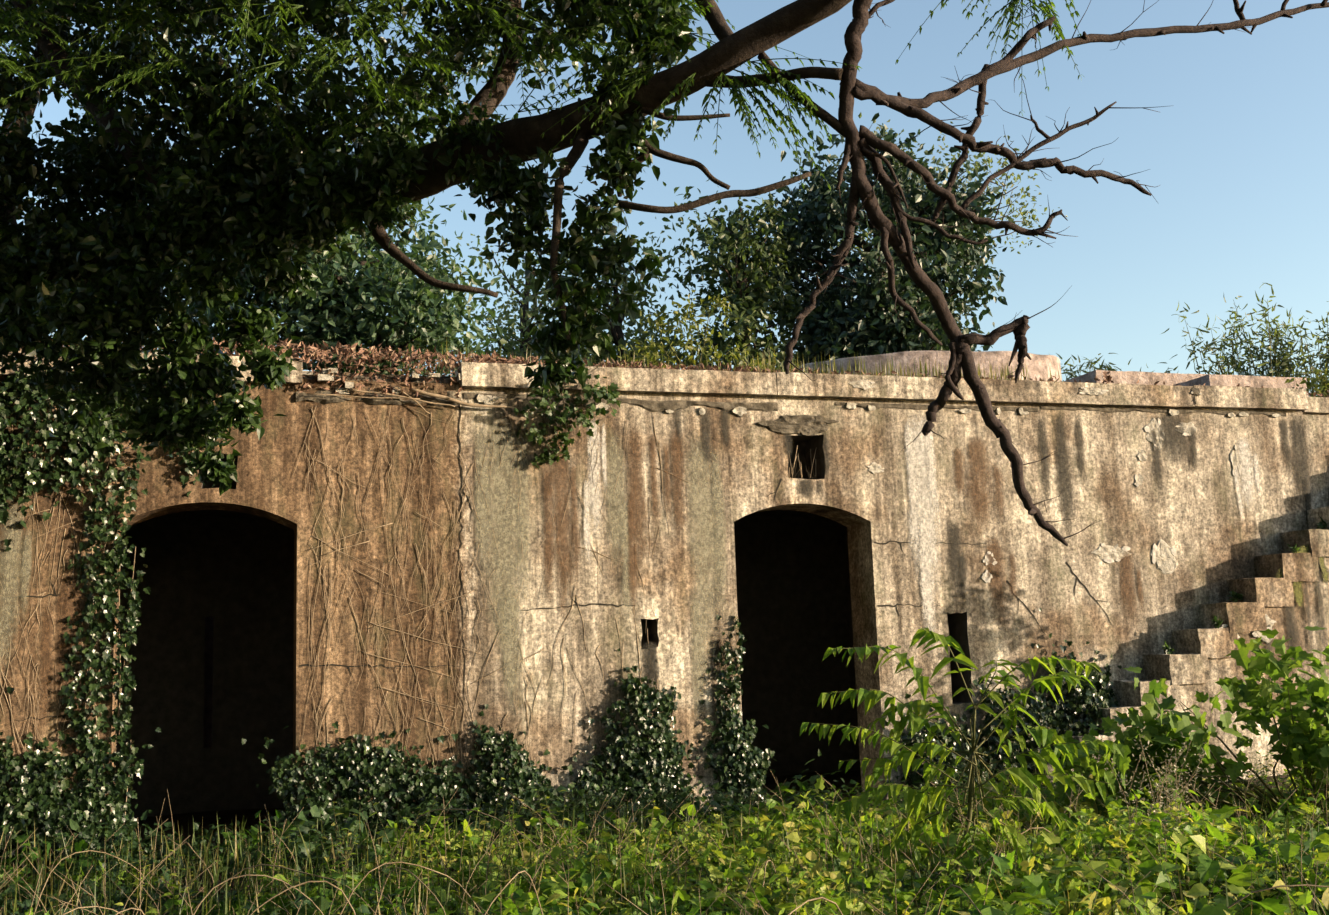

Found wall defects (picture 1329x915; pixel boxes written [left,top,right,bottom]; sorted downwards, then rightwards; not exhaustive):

crack [299,404,635,760]
leakage [584,423,632,616]
leakage [687,408,729,709]
leakage [1039,416,1085,525]
leakage [1152,414,1197,488]